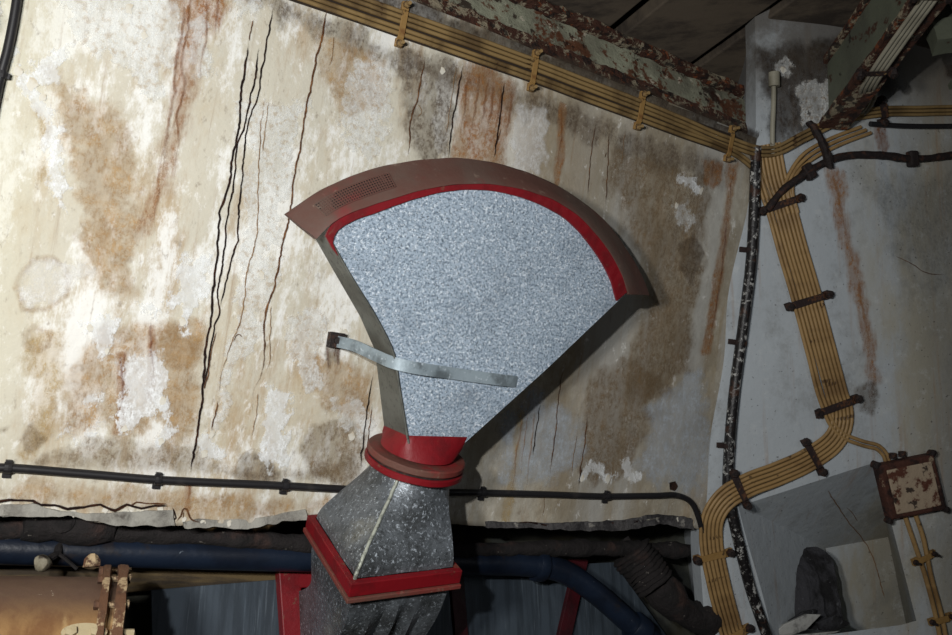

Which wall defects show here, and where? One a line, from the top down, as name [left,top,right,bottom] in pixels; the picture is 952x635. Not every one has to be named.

corrosion [145,0,225,222]
crack [446,71,462,153]
corrosion [453,66,510,162]
crack [494,86,504,156]
peeling [796,83,829,125]
leakage [66,97,138,288]
crack [191,12,334,466]
leakage [500,138,722,493]
corrosion [702,240,724,353]
leakage [70,322,206,434]
crack [0,499,198,522]
leakage [299,425,365,485]